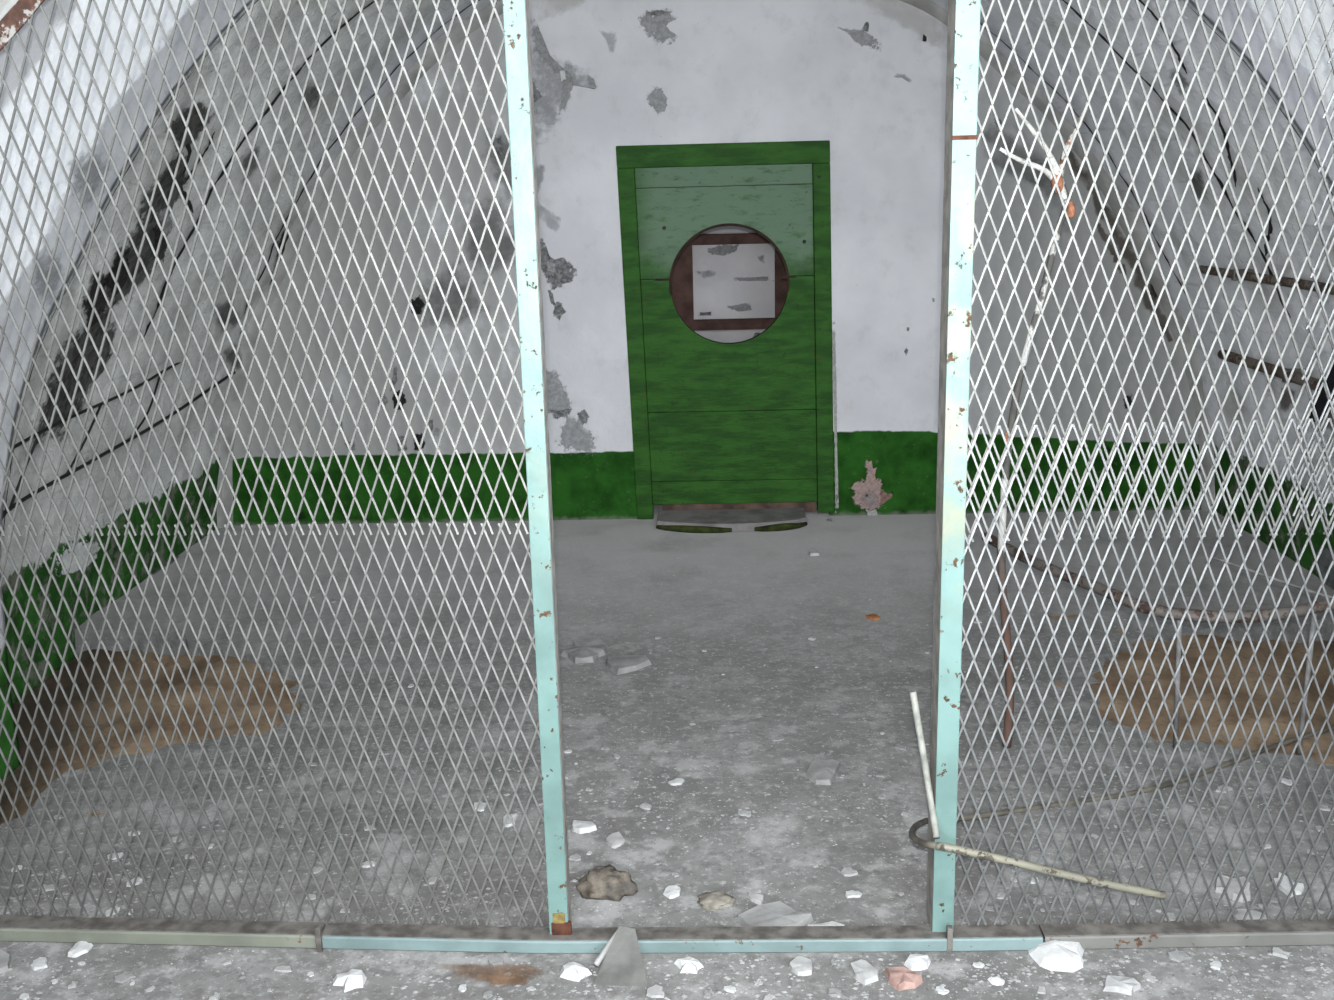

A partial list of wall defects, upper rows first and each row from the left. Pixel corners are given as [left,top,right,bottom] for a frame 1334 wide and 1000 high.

flaking render [532,26,596,111]
peeling [638,10,676,44]
peeling [647,87,667,113]
flaking render [841,22,880,49]
flaking render [540,239,577,320]
flaking render [546,371,594,453]
flaking render [832,323,893,516]